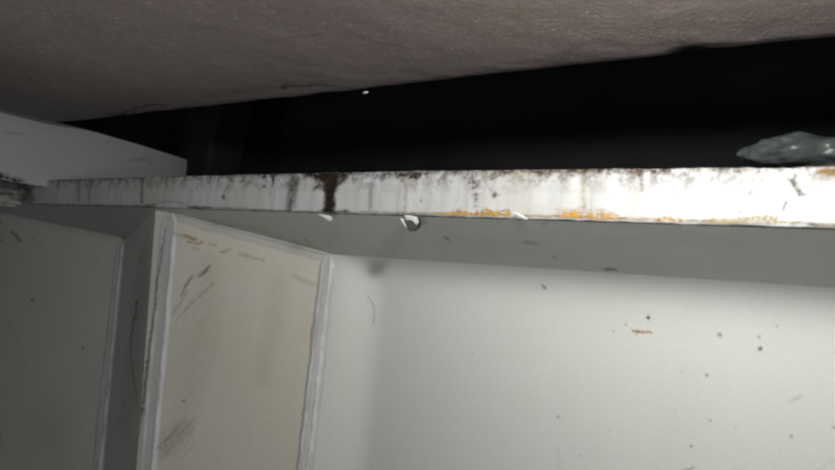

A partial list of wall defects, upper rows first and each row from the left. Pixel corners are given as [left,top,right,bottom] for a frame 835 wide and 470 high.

rust [438,208,510,216]
rust [549,211,625,220]
rust [702,216,777,224]